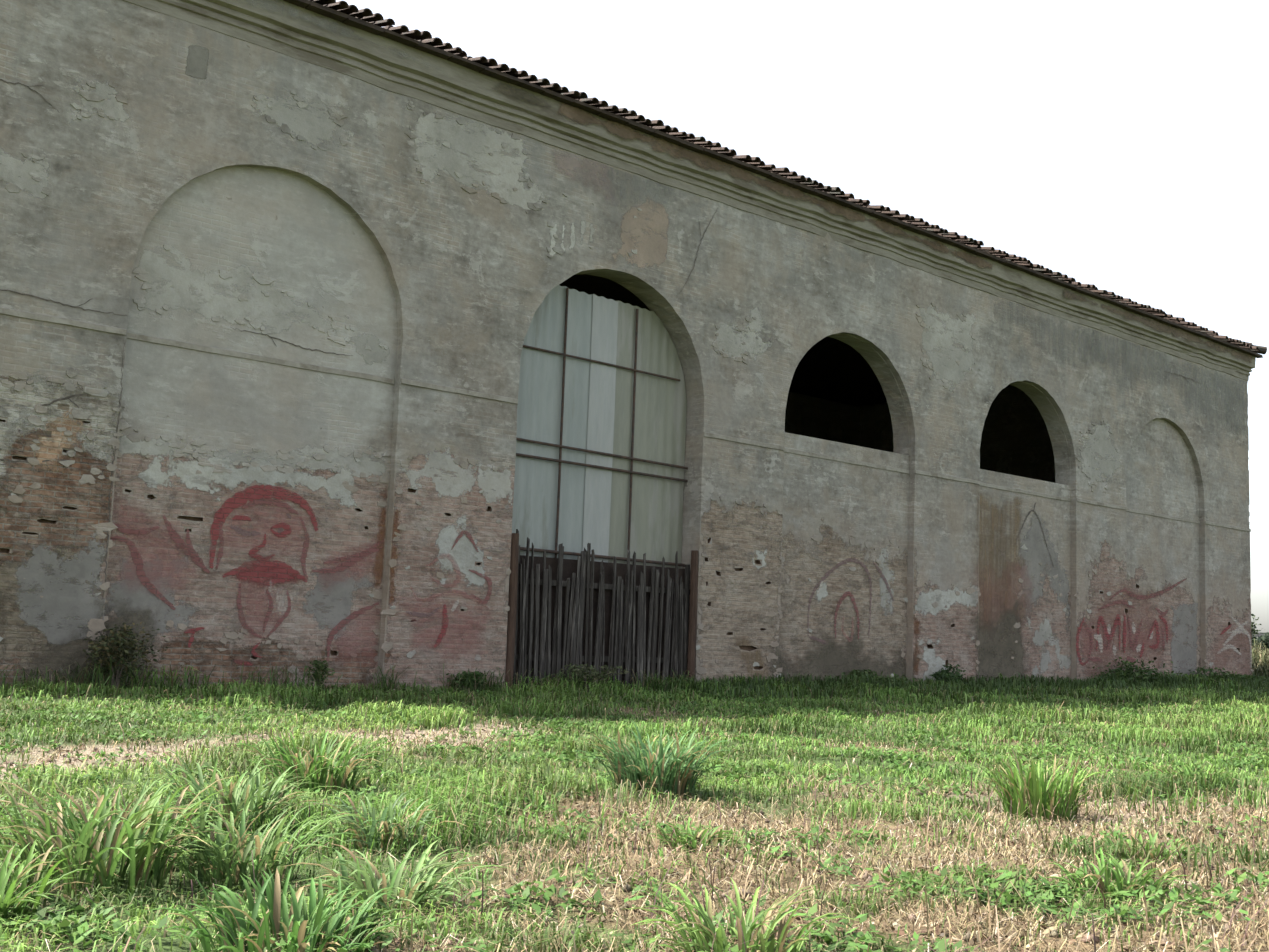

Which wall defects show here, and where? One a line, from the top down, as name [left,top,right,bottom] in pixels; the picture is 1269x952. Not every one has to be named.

peeling [404,99,594,258]
peeling [0,368,515,691]
peeling [695,494,981,683]
damp [976,495,1026,683]
spalling [1079,540,1254,680]